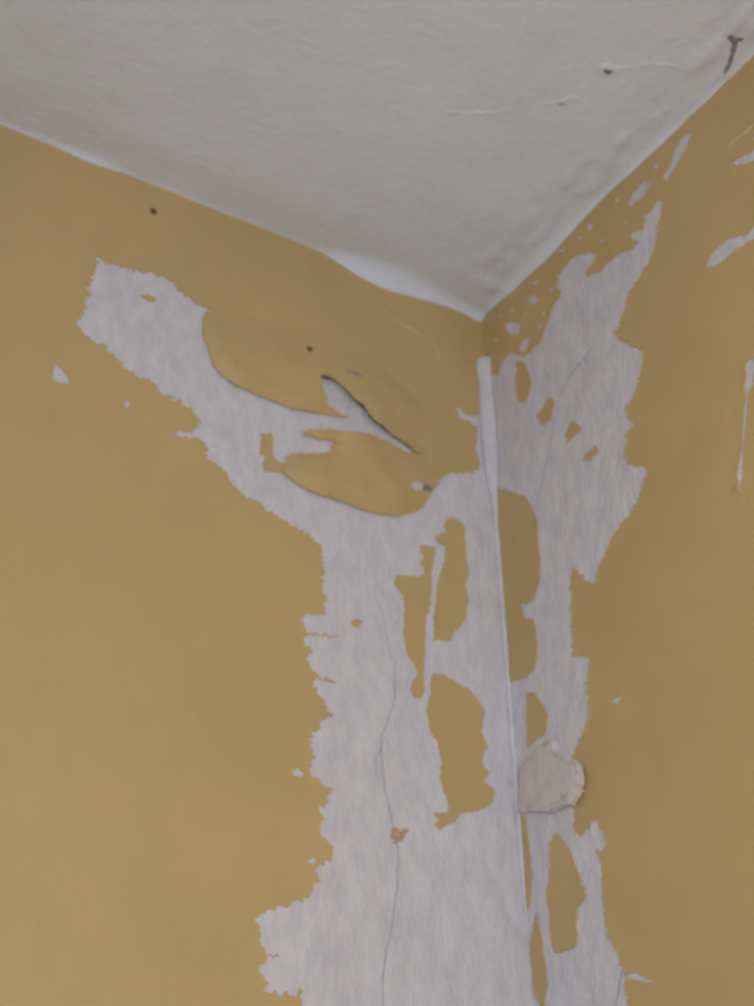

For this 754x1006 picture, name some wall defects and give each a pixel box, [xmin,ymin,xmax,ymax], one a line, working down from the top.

crack [723,34,744,74]
peeling [654,133,691,181]
peeling [615,180,650,206]
peeling [706,227,754,267]
peeling [52,364,70,384]
peeling [77,198,663,1006]
crack [374,597,399,1006]